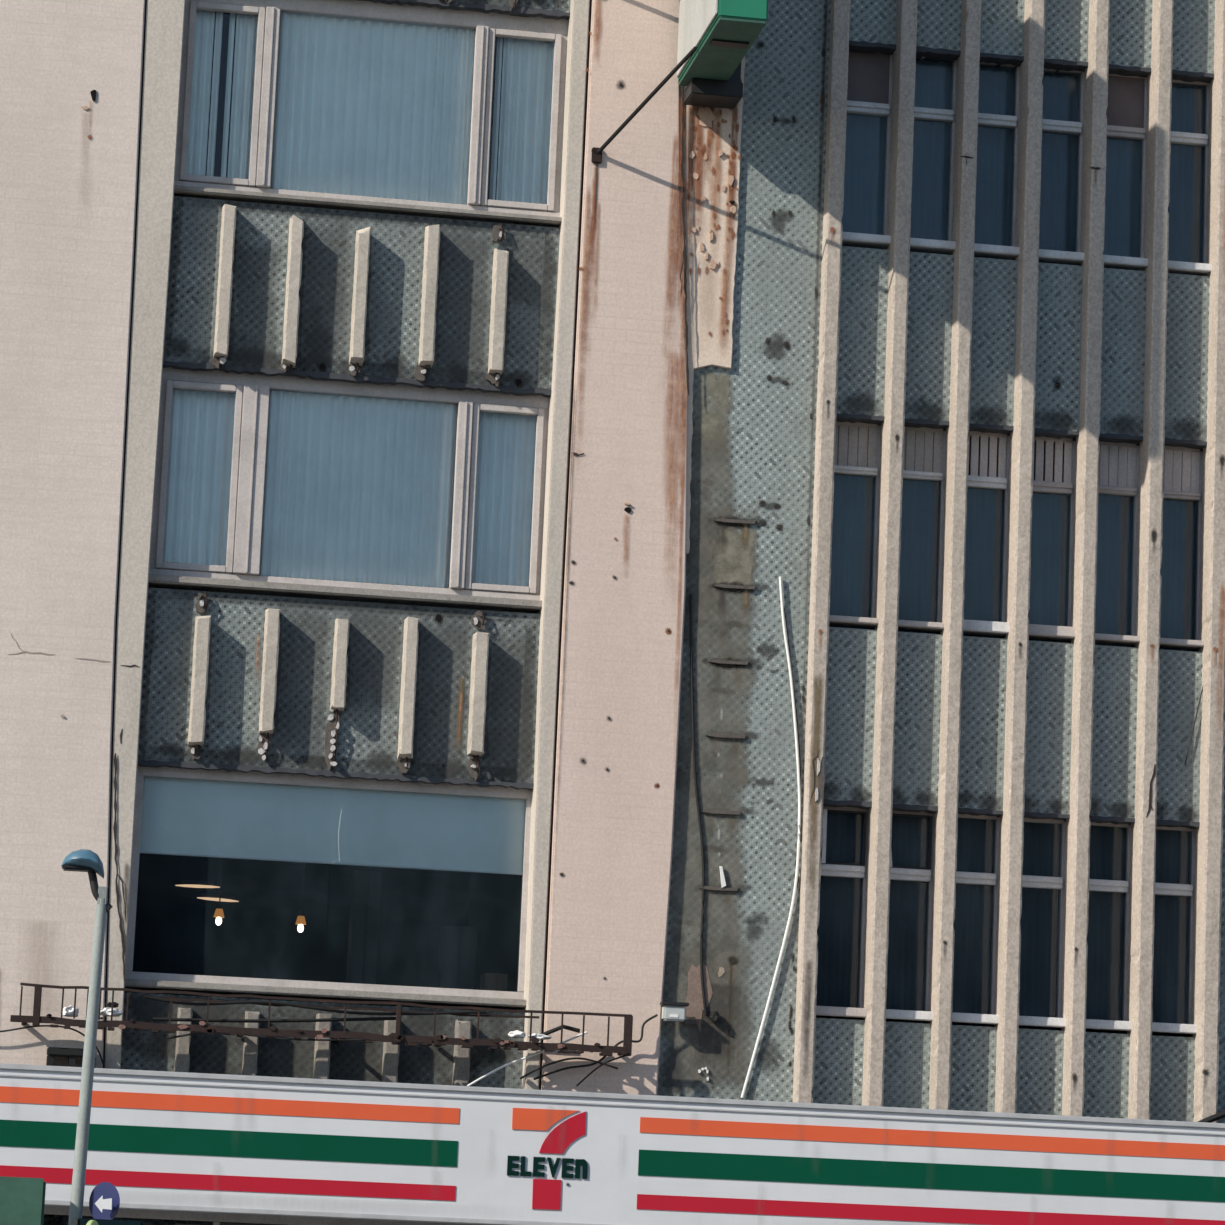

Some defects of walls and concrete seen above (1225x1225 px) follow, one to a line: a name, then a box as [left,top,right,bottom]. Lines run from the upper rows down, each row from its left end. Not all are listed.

rust [579,164,599,338]
rust [668,100,686,646]
peeling [687,105,736,275]
rust [709,106,741,336]
leakage [810,157,829,439]
leakage [759,500,783,530]
crack [7,634,139,667]
leakage [757,644,778,673]
leakage [705,829,726,888]